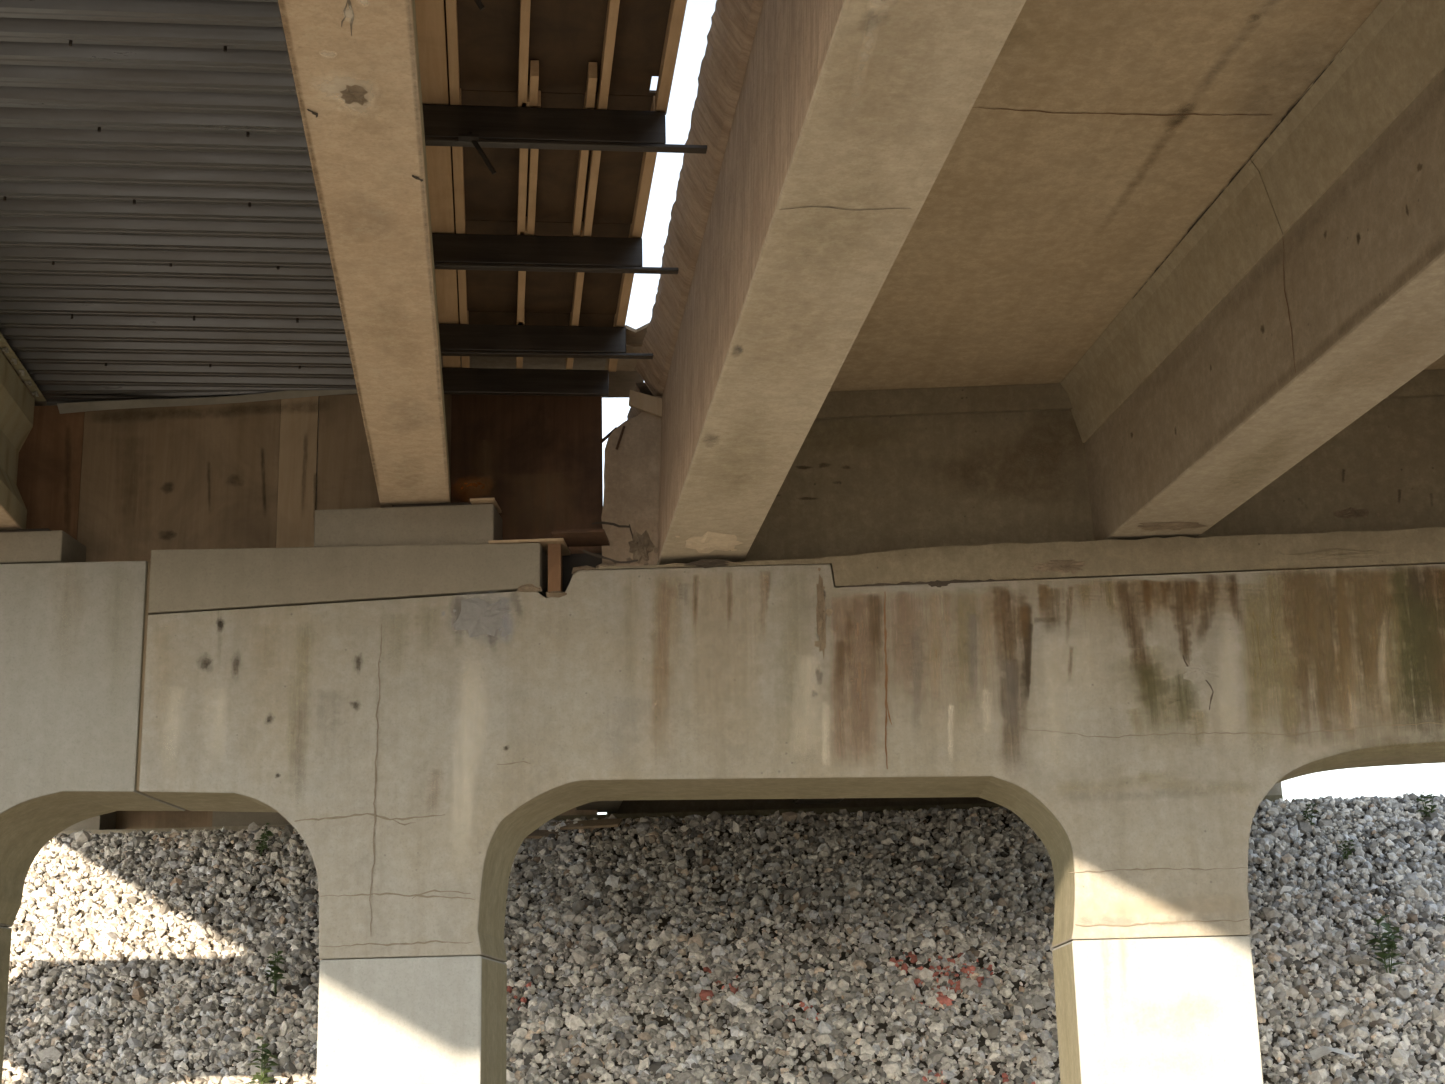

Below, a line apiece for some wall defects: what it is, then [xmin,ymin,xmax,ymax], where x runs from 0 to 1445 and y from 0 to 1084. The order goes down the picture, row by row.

crack [295,624,475,947]
rust [1107,575,1264,717]